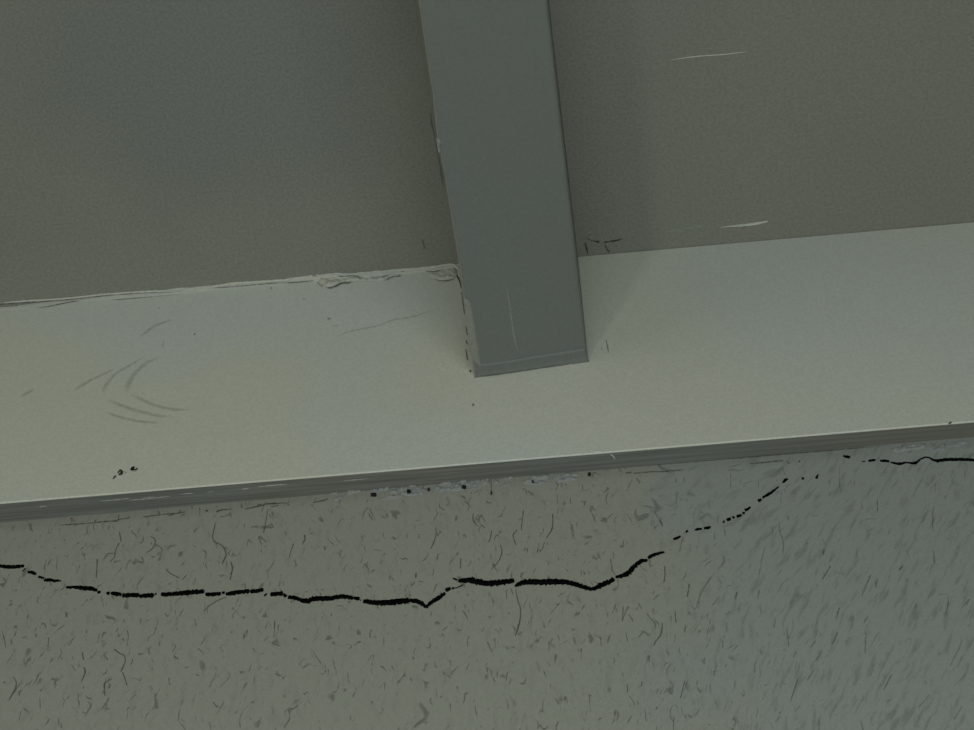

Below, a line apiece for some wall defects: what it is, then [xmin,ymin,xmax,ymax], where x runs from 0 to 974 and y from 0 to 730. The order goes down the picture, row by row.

crack [0,448,974,636]